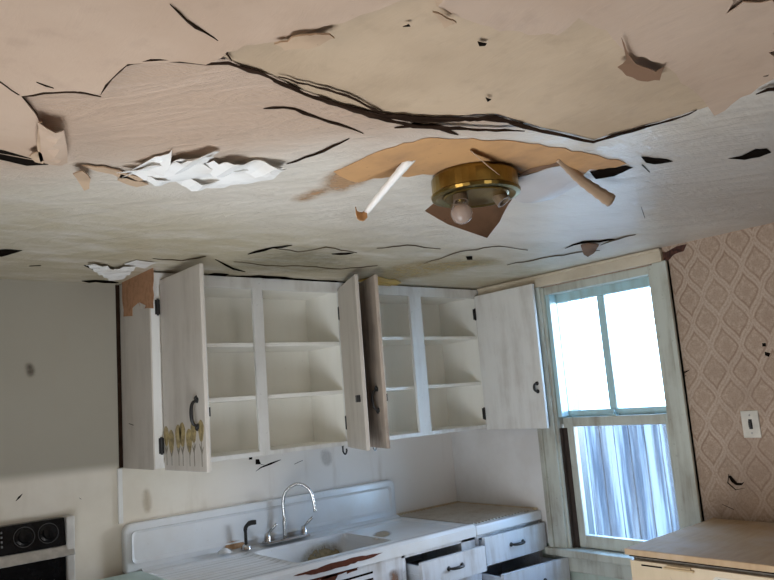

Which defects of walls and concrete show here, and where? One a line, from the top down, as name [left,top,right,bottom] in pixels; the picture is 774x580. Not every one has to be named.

crack [0,4,697,166]
peeling [0,0,774,166]
crack [756,75,774,95]
crack [642,157,673,173]
crack [728,149,771,160]
peeling [334,138,633,238]
crack [208,245,345,283]
peeling [122,268,154,317]
corrosion [294,545,381,580]